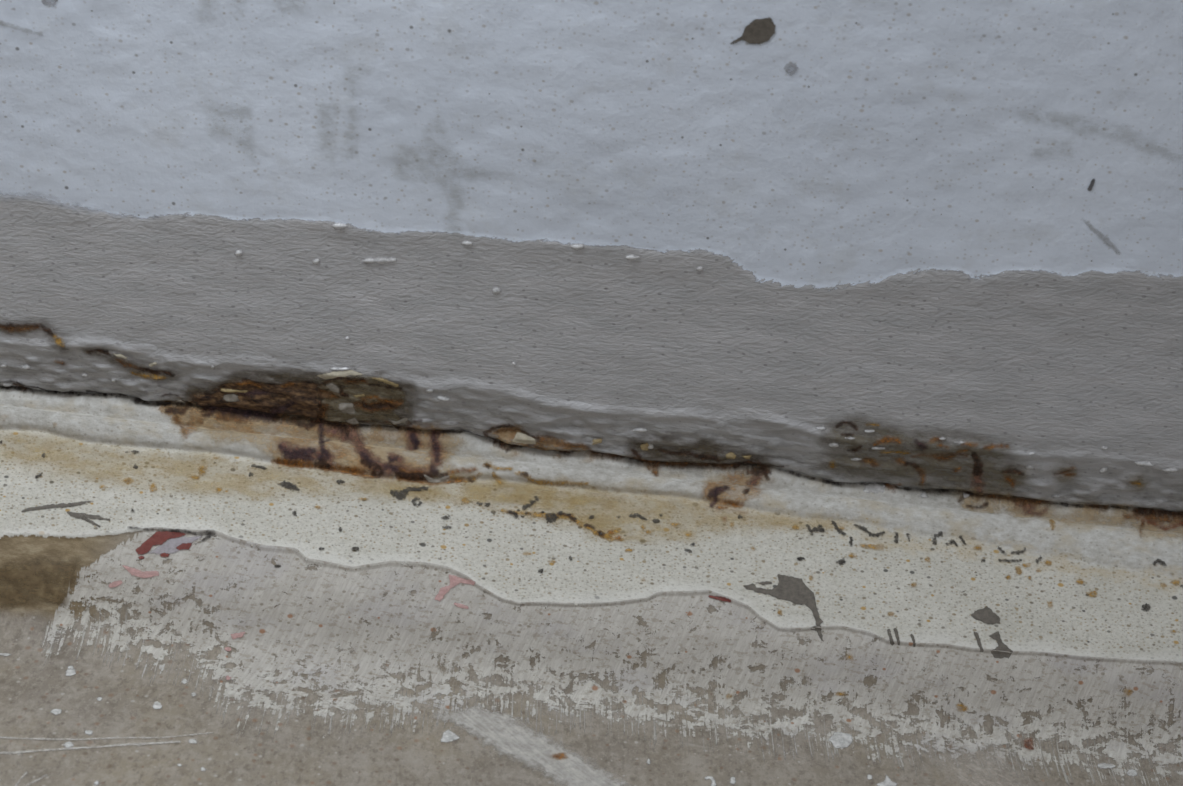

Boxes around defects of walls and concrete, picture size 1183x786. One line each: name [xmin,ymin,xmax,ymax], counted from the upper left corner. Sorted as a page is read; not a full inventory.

rust [0,324,66,365]
rust [85,349,174,380]
rust [162,370,588,485]
spalling [390,486,429,506]
spalling [509,496,594,526]
rust [501,509,632,551]
rust [484,424,783,526]
spalling [806,521,910,546]
rust [826,419,1183,537]
peeling [41,527,1183,786]